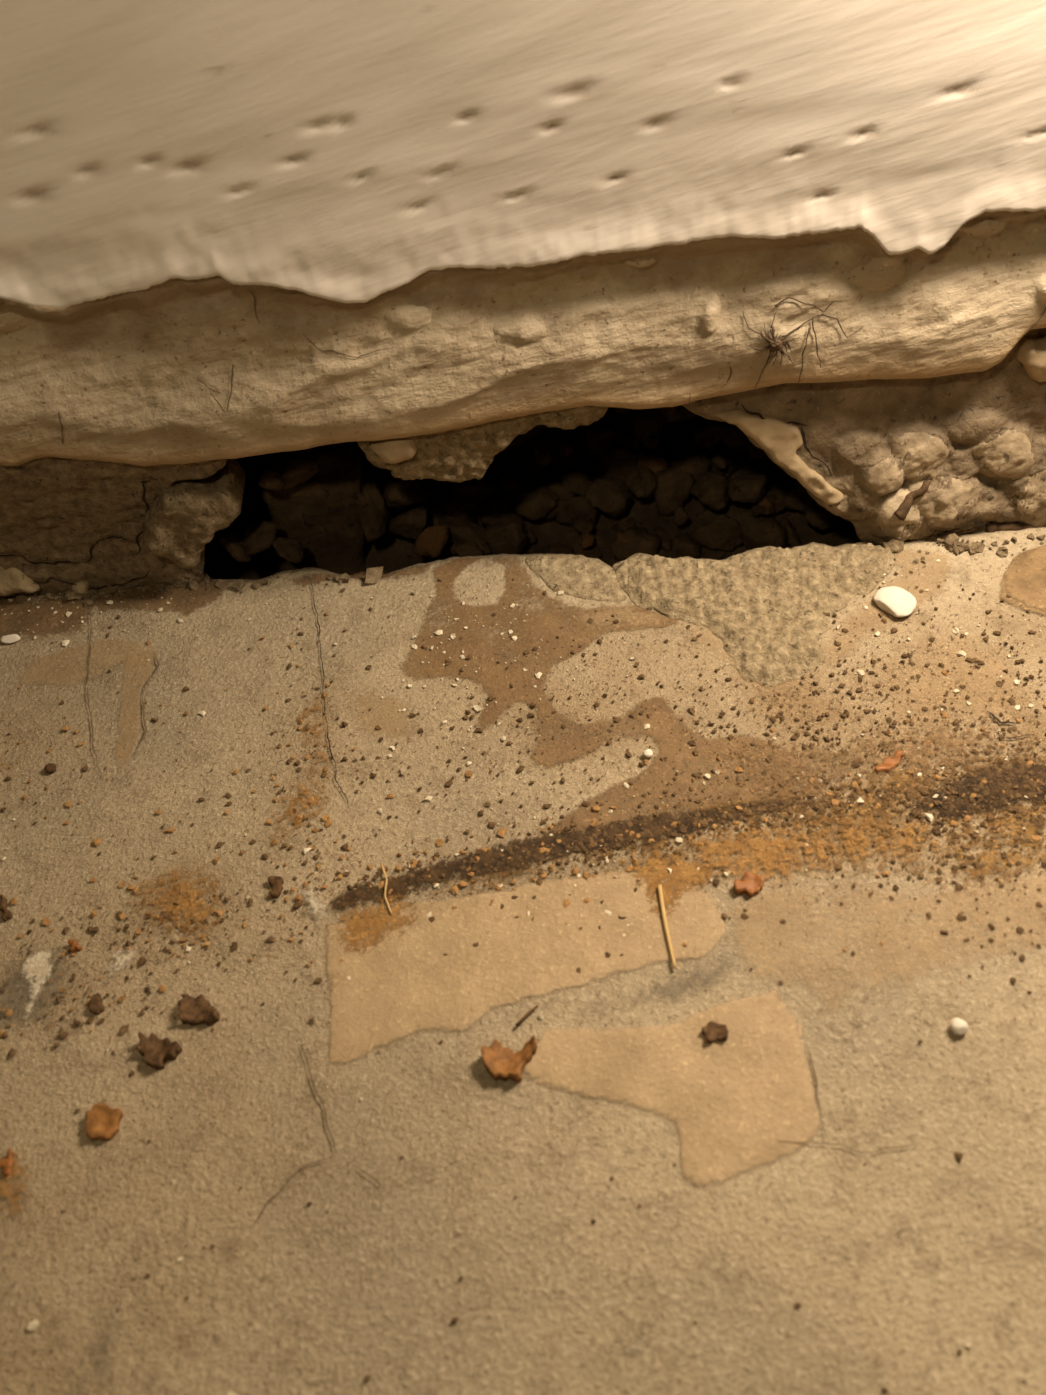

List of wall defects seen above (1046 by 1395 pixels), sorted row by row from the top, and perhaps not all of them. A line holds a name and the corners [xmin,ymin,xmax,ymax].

peeling [0,209,1046,600]
crack [309,576,350,810]
damp [294,557,1046,851]